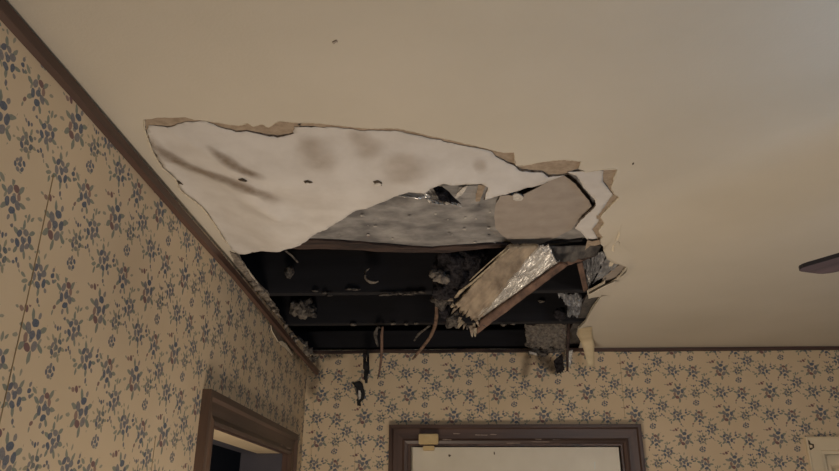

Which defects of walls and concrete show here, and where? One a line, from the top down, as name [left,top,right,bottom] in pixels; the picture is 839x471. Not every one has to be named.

peeling [577,238,637,367]